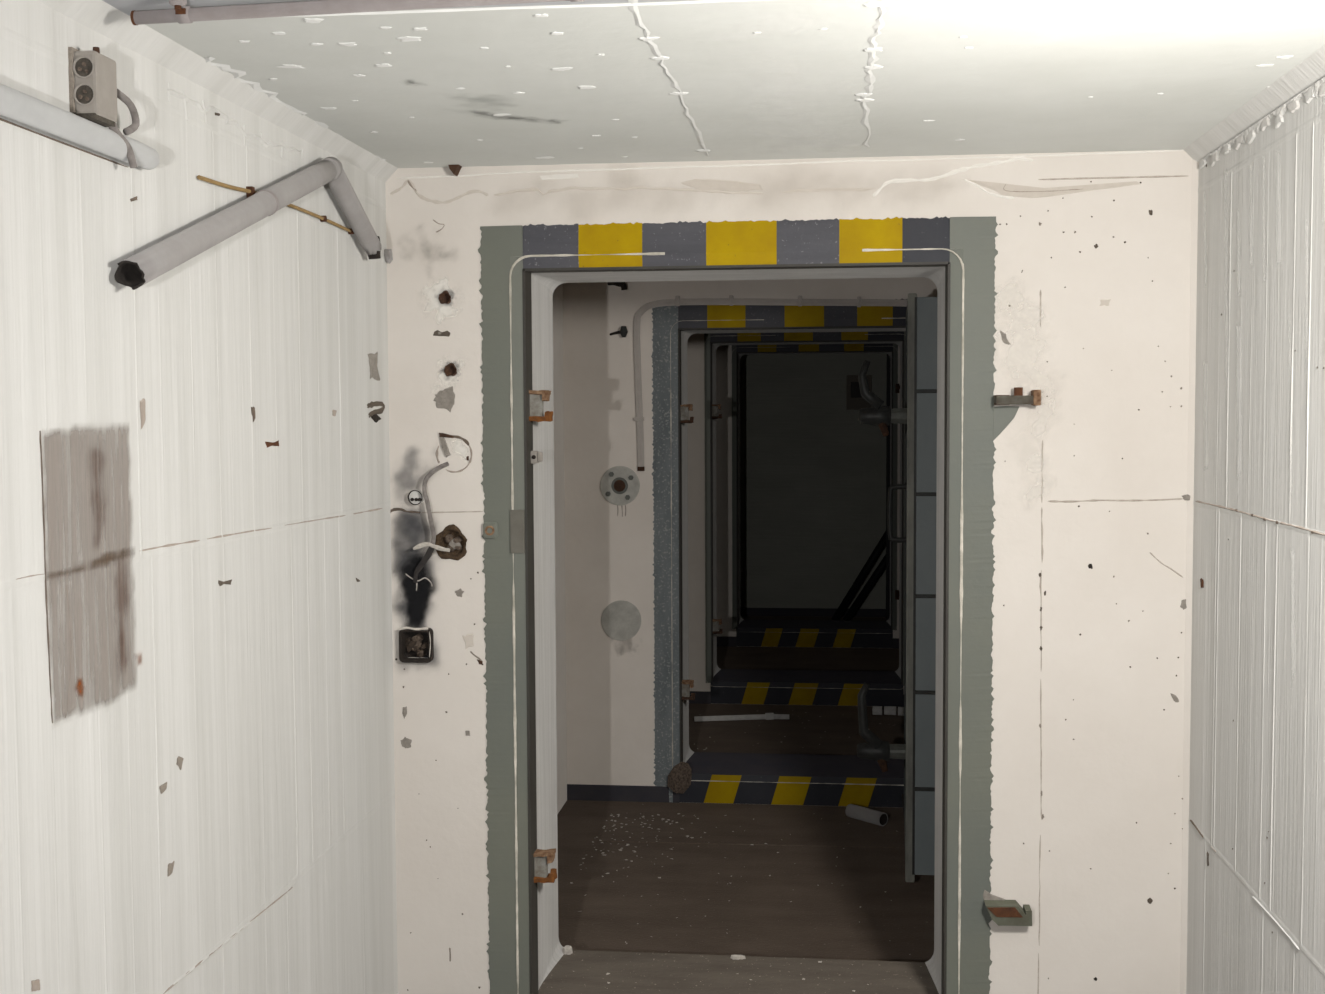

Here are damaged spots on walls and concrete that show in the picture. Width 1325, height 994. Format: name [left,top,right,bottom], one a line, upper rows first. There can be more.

spalling [424,280,453,337]
spalling [433,363,459,412]
rust [988,907,1022,917]